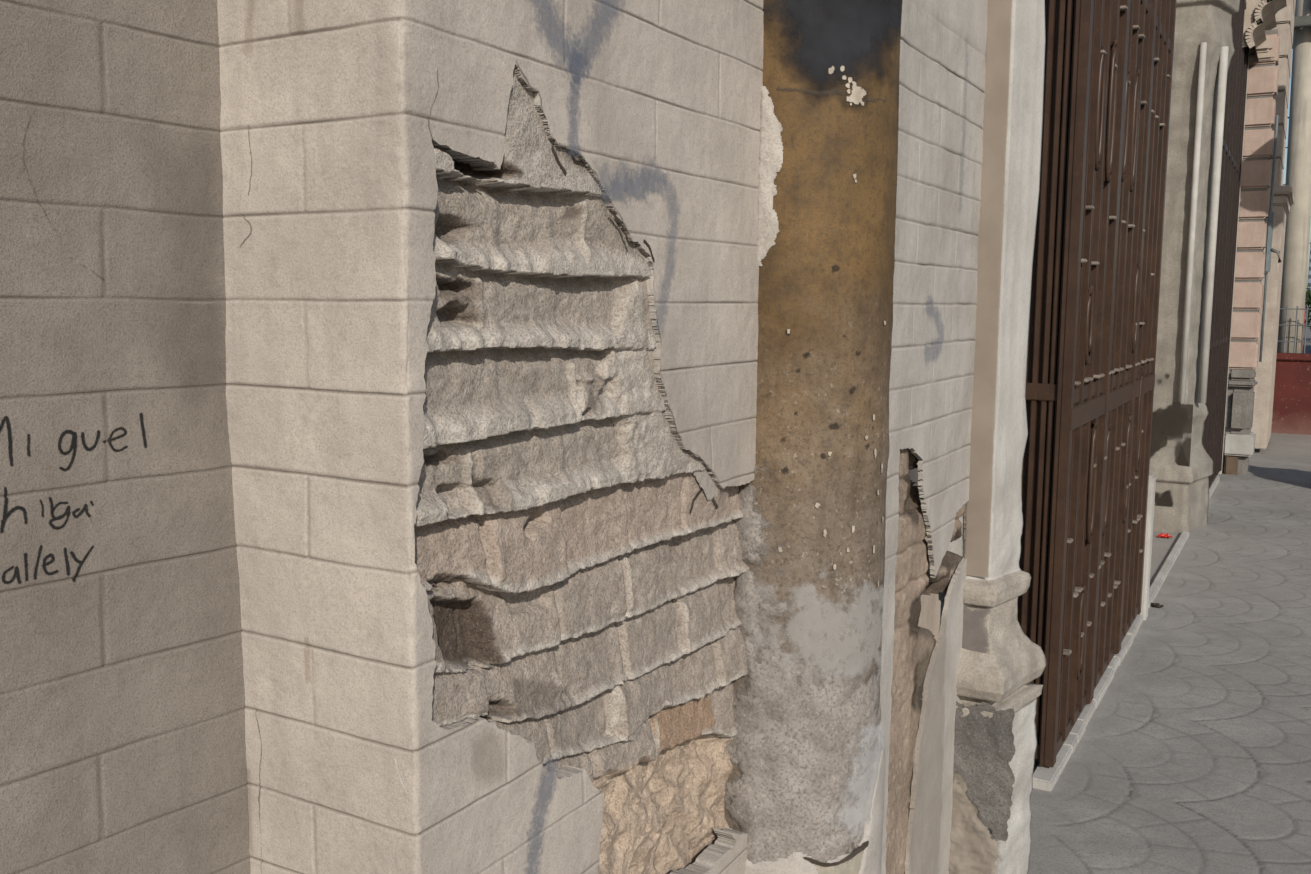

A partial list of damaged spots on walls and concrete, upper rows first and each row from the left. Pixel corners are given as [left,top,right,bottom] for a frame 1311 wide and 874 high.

spalling [414,64,749,874]
spalling [948,773,1001,874]